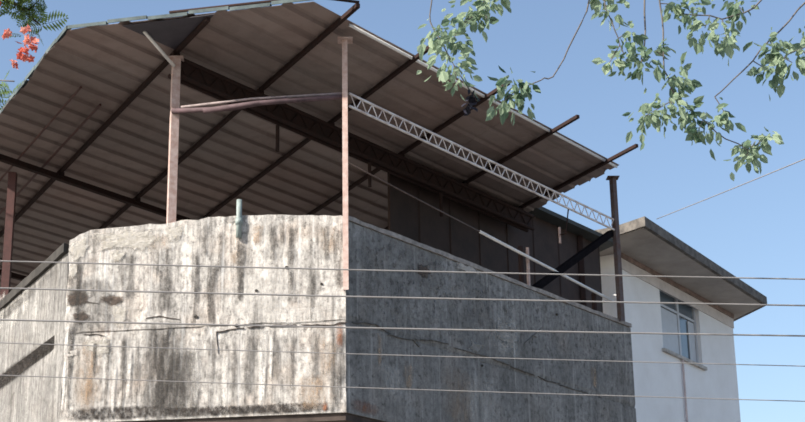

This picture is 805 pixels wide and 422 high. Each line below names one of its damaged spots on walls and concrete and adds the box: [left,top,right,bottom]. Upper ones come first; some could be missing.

leakage [207,238,222,322]
leakage [237,244,263,308]
leakage [269,227,294,293]
leakage [61,264,92,408]
leakage [104,327,199,411]
crack [216,326,257,347]
leakage [247,335,279,401]
crack [276,322,588,394]